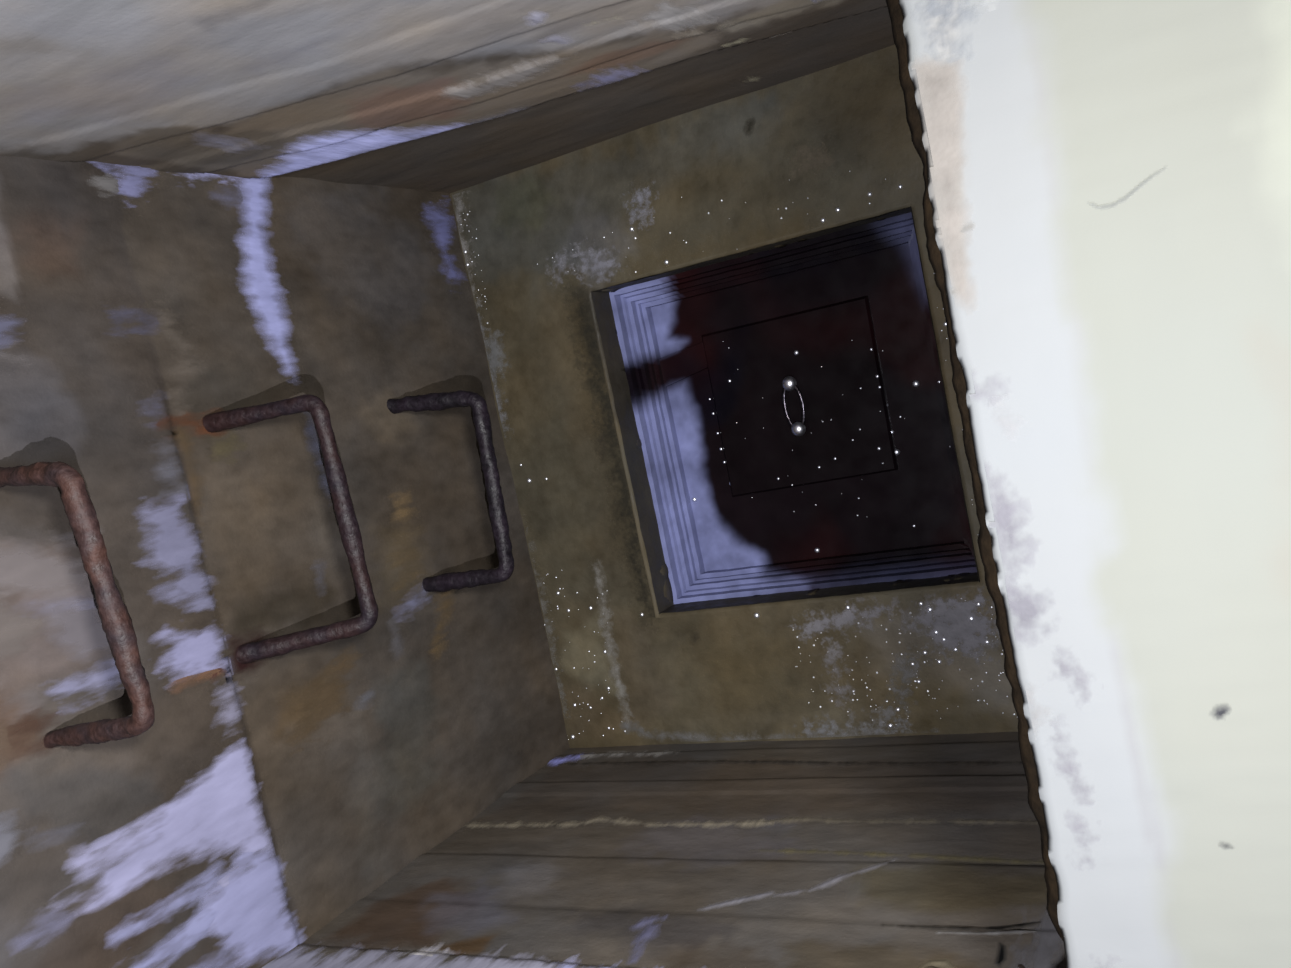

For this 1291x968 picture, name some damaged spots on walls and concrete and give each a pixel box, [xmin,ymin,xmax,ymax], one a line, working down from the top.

efflorescence [90,161,156,197]
efflorescence [187,118,494,373]
efflorescence [792,589,1000,737]
efflorescence [16,740,576,968]
efflorescence [630,917,666,963]